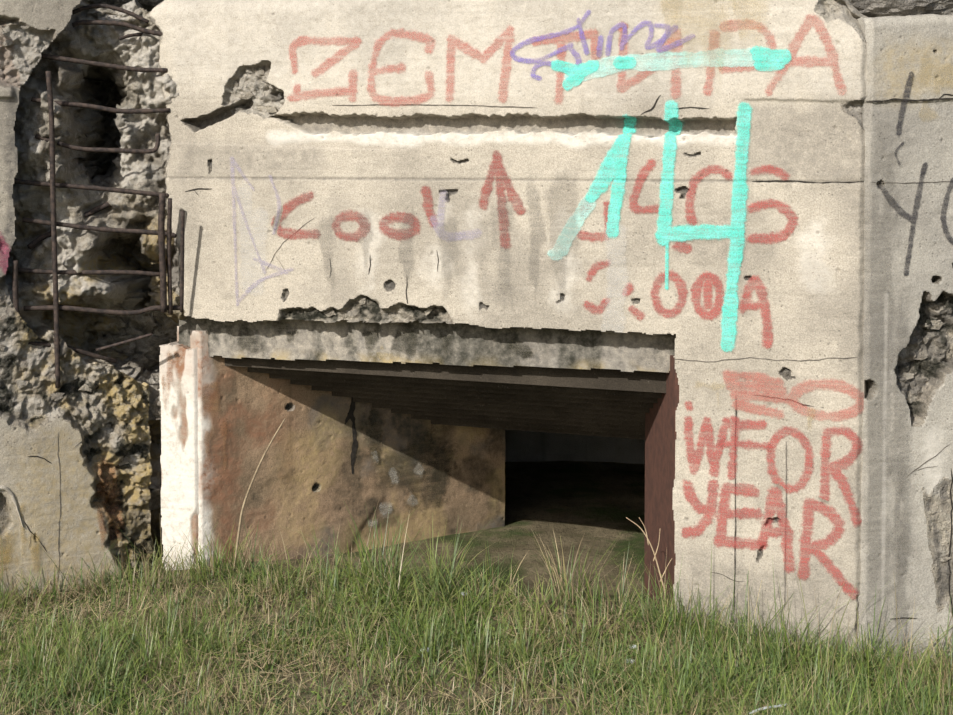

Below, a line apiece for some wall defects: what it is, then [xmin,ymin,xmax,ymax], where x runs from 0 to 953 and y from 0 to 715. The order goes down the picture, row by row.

spalling [0,1,285,576]
spalling [276,288,454,324]
peeling [383,279,395,292]
spalling [894,291,953,427]
crack [345,397,358,474]